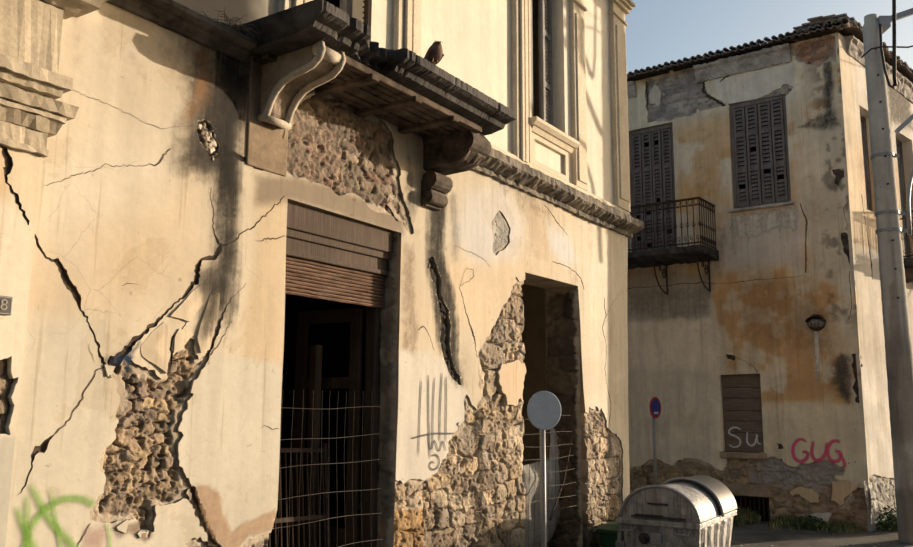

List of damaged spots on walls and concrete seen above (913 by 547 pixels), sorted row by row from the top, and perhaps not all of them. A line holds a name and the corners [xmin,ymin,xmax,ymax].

crack [46,89,264,186]
damp [191,51,246,334]
flaking render [282,89,412,234]
damp [805,61,837,127]
flaking render [0,358,13,434]
crack [1,146,285,495]
flaking render [90,339,275,547]
damp [427,207,463,384]
flaking render [378,277,526,547]
crack [459,248,487,356]
flaking render [581,407,897,547]
damp [833,355,851,402]